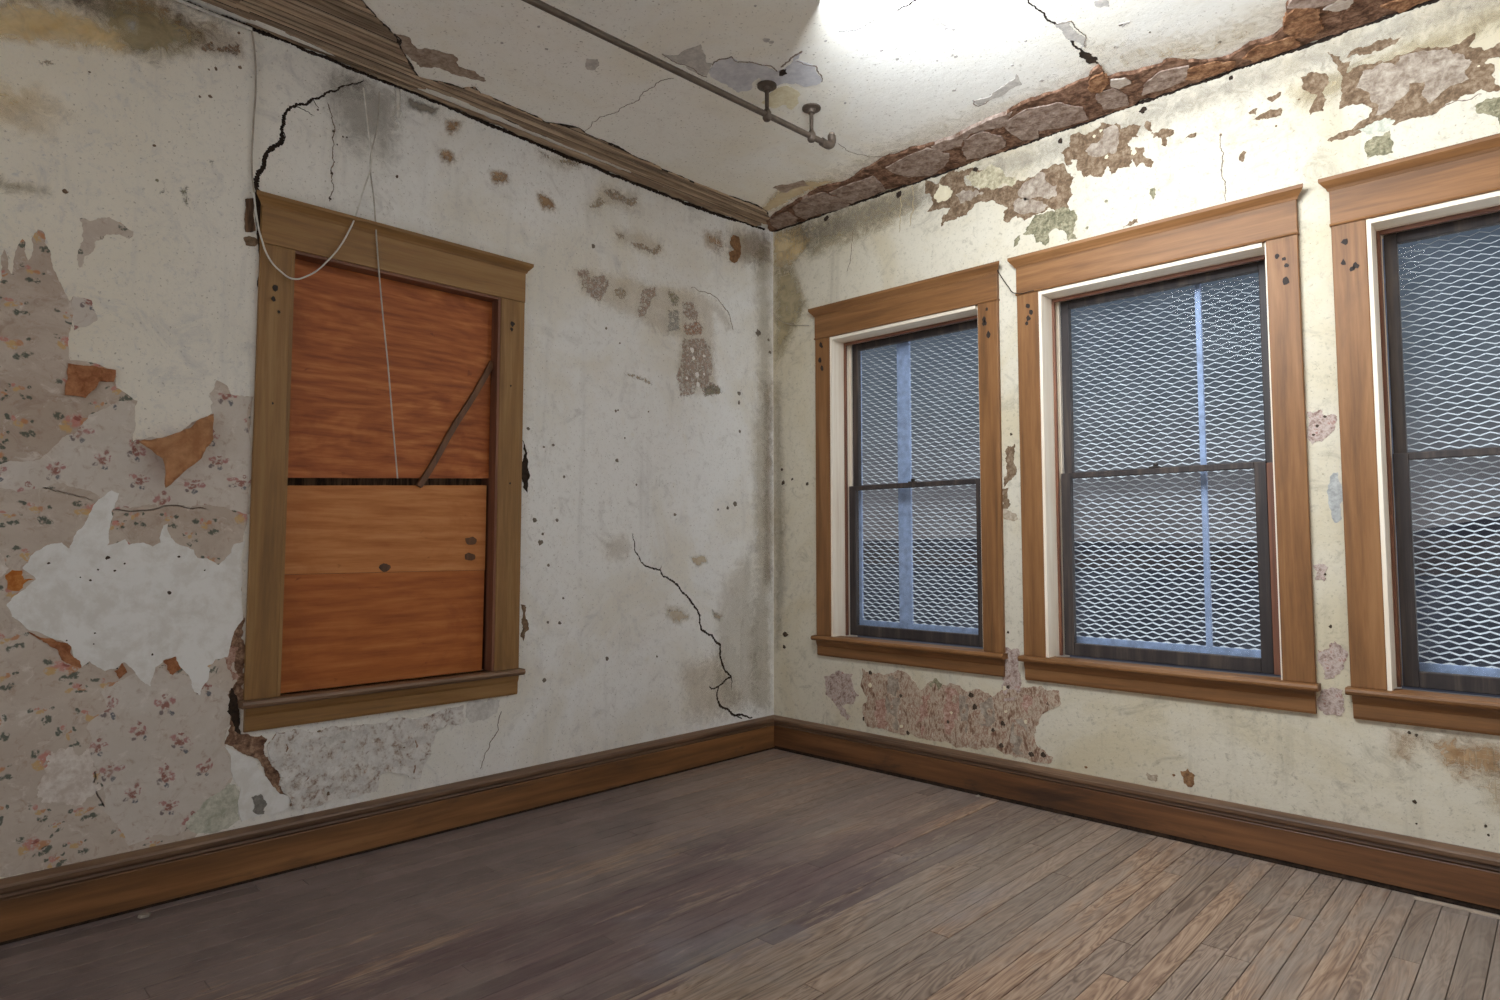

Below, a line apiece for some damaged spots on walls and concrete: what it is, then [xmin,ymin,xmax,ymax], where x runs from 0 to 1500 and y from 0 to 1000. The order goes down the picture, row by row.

flaking render [243,186,261,252]
crack [253,80,364,201]
peeling [394,34,486,82]
peeling [662,44,823,110]
spalling [972,64,1044,107]
peeling [925,121,1196,247]
crack [1028,0,1098,64]
peeling [1249,32,1500,157]
flaking render [578,270,741,404]
spalling [1002,433,1018,521]
flaking render [5,490,290,834]
crack [632,535,753,719]